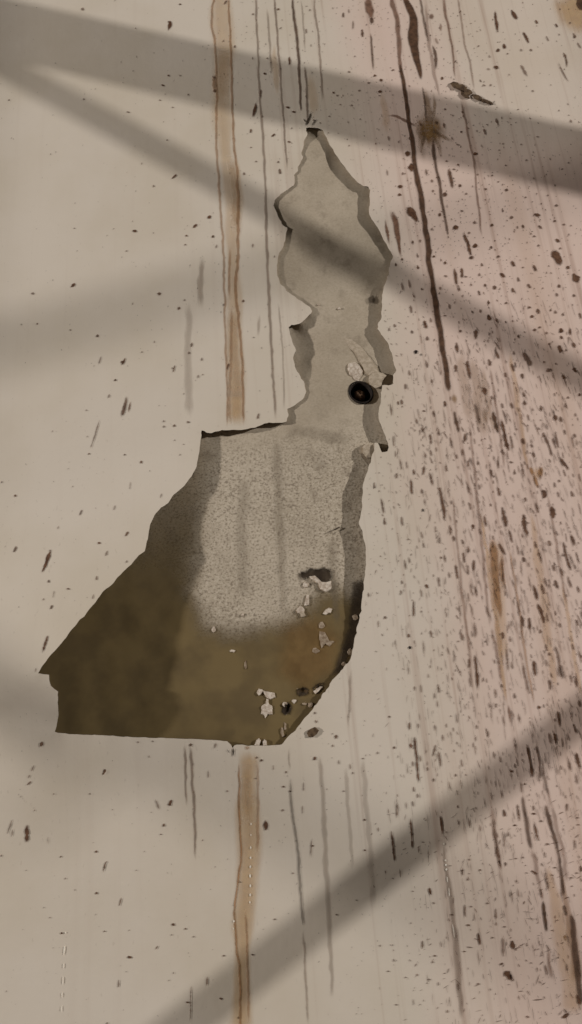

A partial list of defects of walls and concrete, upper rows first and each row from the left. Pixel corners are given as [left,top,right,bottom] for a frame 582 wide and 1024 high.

corrosion [228,4,244,417]
peeling [148,127,396,747]
corrosion [391,115,440,143]
damp [385,0,537,616]
damp [482,388,581,476]
damp [504,306,577,379]
damp [551,239,580,297]
damp [39,521,359,850]
damp [502,480,580,693]
corrosion [233,772,242,1024]